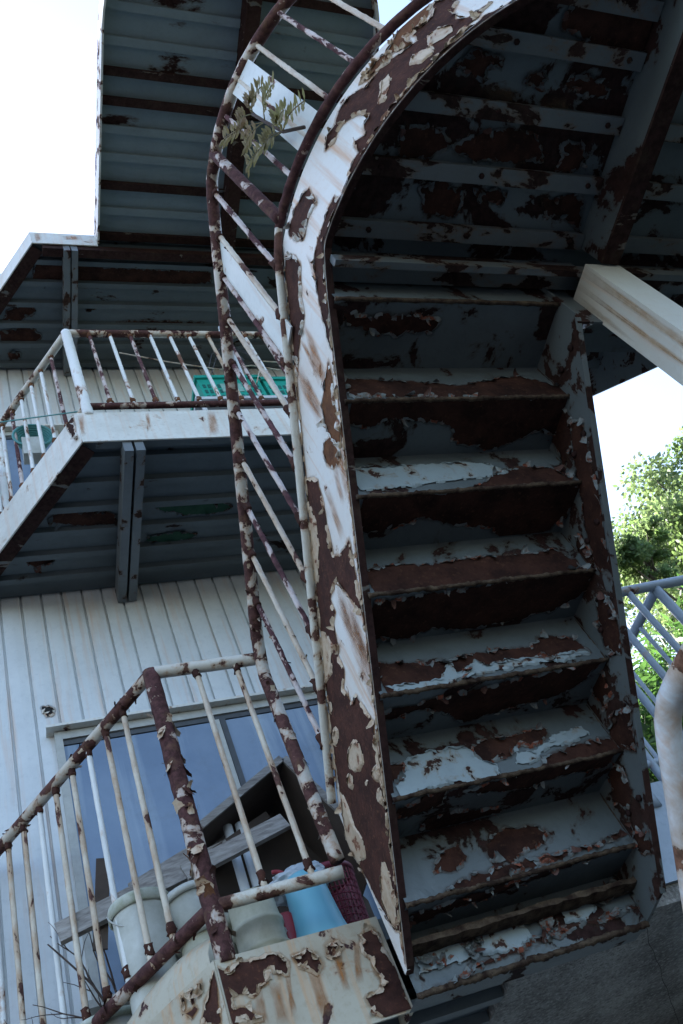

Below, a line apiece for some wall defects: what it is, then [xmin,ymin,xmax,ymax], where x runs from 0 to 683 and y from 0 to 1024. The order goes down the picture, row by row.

peeling [179,0,653,1024]
peeling [114,695,181,740]
peeling [162,754,199,814]